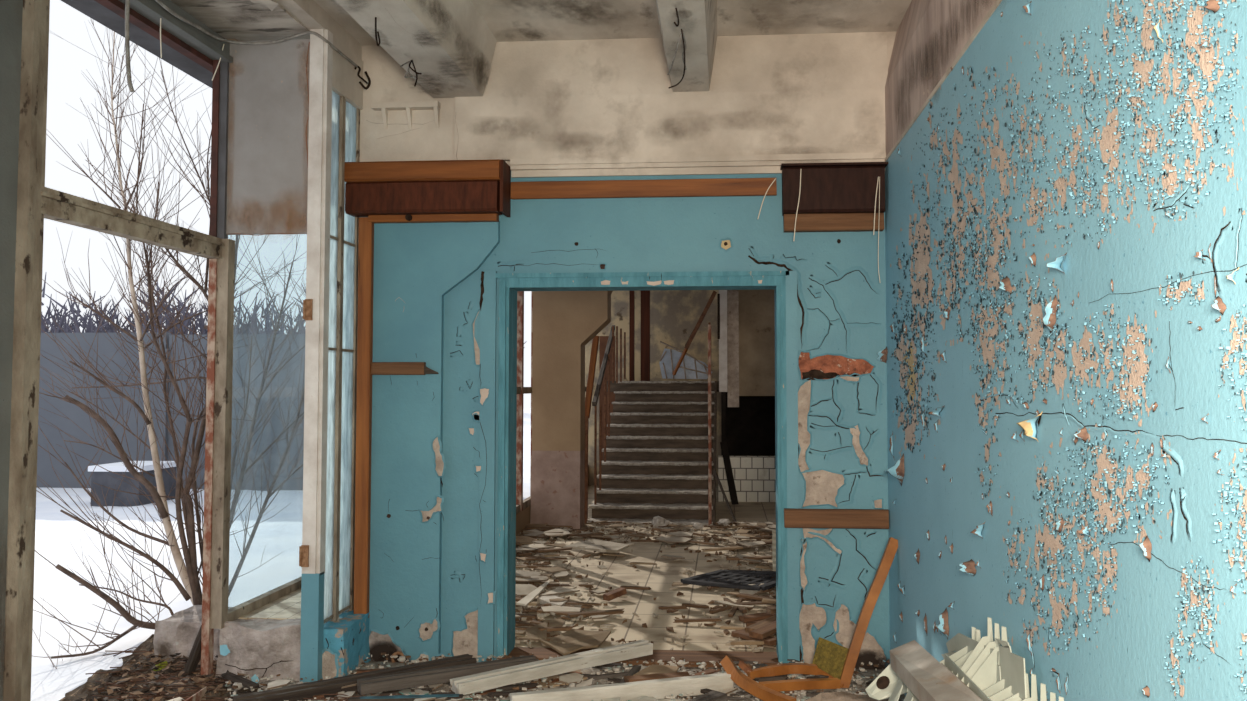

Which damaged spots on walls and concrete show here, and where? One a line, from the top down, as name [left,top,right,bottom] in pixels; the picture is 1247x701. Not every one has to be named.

crack [1090,208,1247,303]
peeling [798,0,1247,701]
spalling [431,435,446,478]
spalling [467,386,491,436]
crack [748,246,886,640]
crack [980,322,1247,590]
spalling [419,495,444,523]
spalling [369,591,495,662]